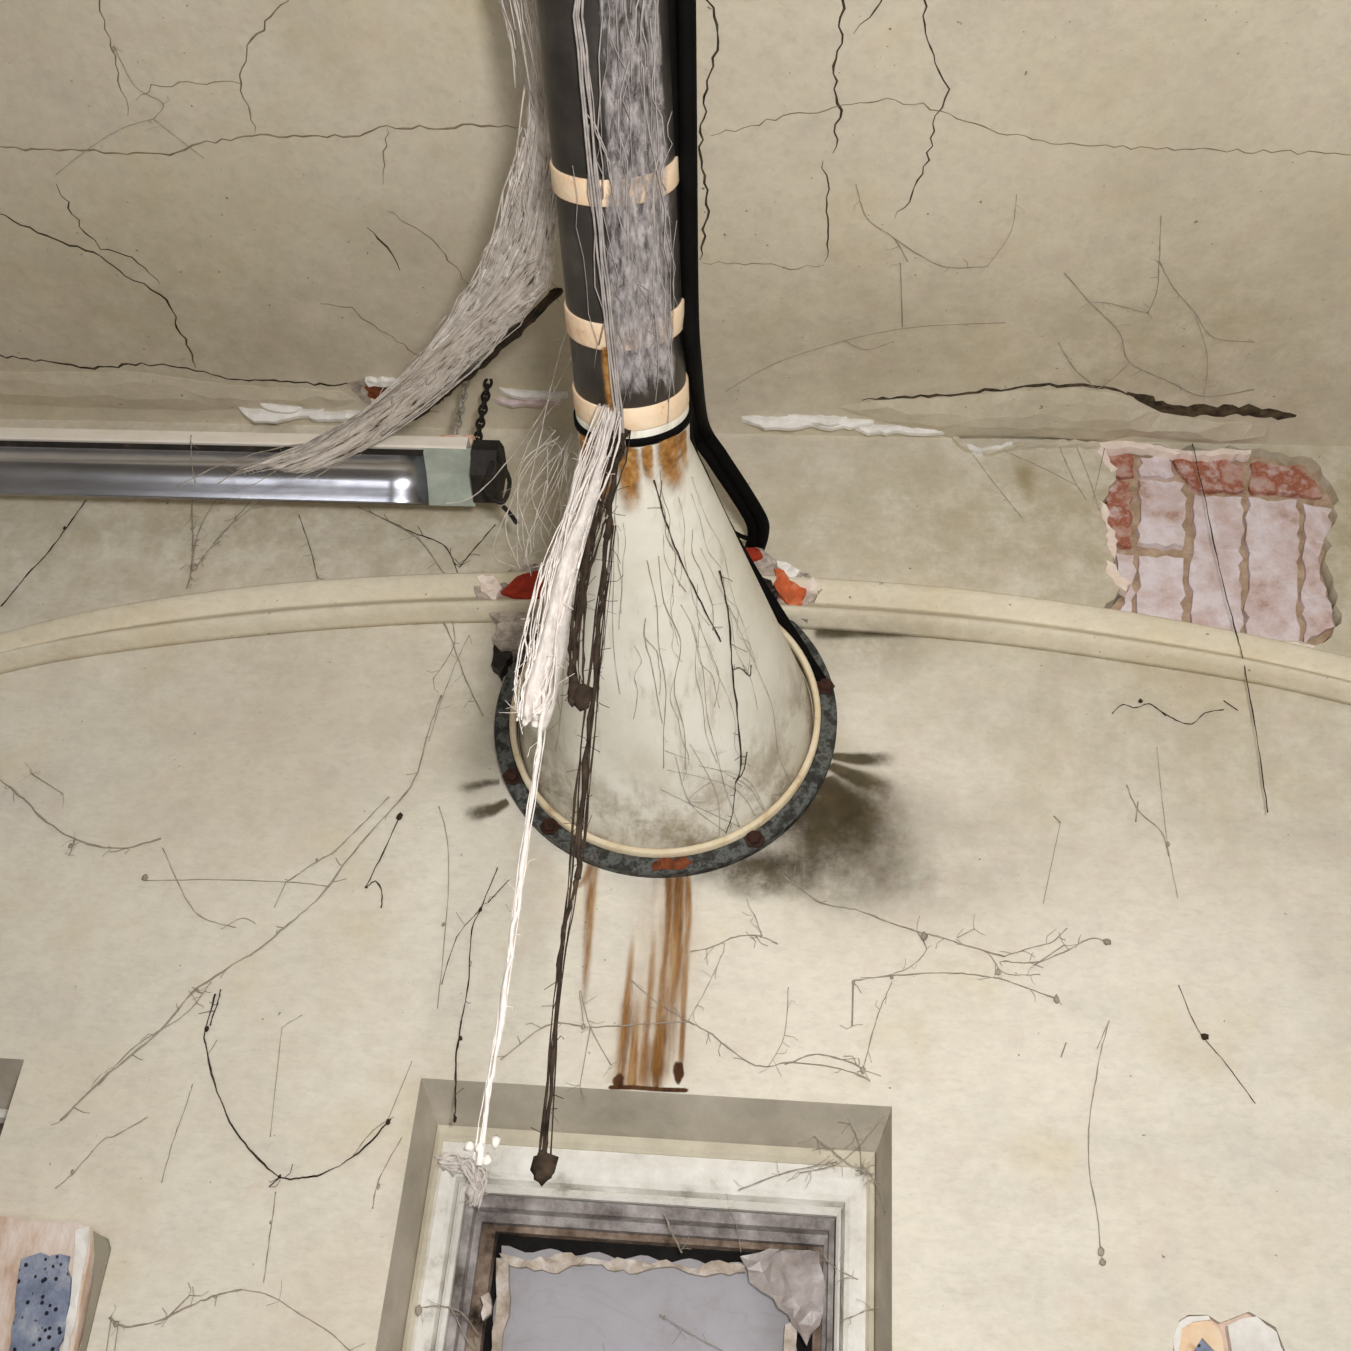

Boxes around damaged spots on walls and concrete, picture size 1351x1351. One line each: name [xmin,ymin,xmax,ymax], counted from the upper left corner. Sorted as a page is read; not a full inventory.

crack [862,383,1297,420]
spalling [741,414,1336,649]
spalling [474,562,545,682]
water stain [793,763,880,855]
corrosion [578,868,596,978]
corrosion [609,856,693,1092]
water stain [729,856,801,888]
spalling [0,1216,111,1351]
spalling [1172,1313,1283,1351]